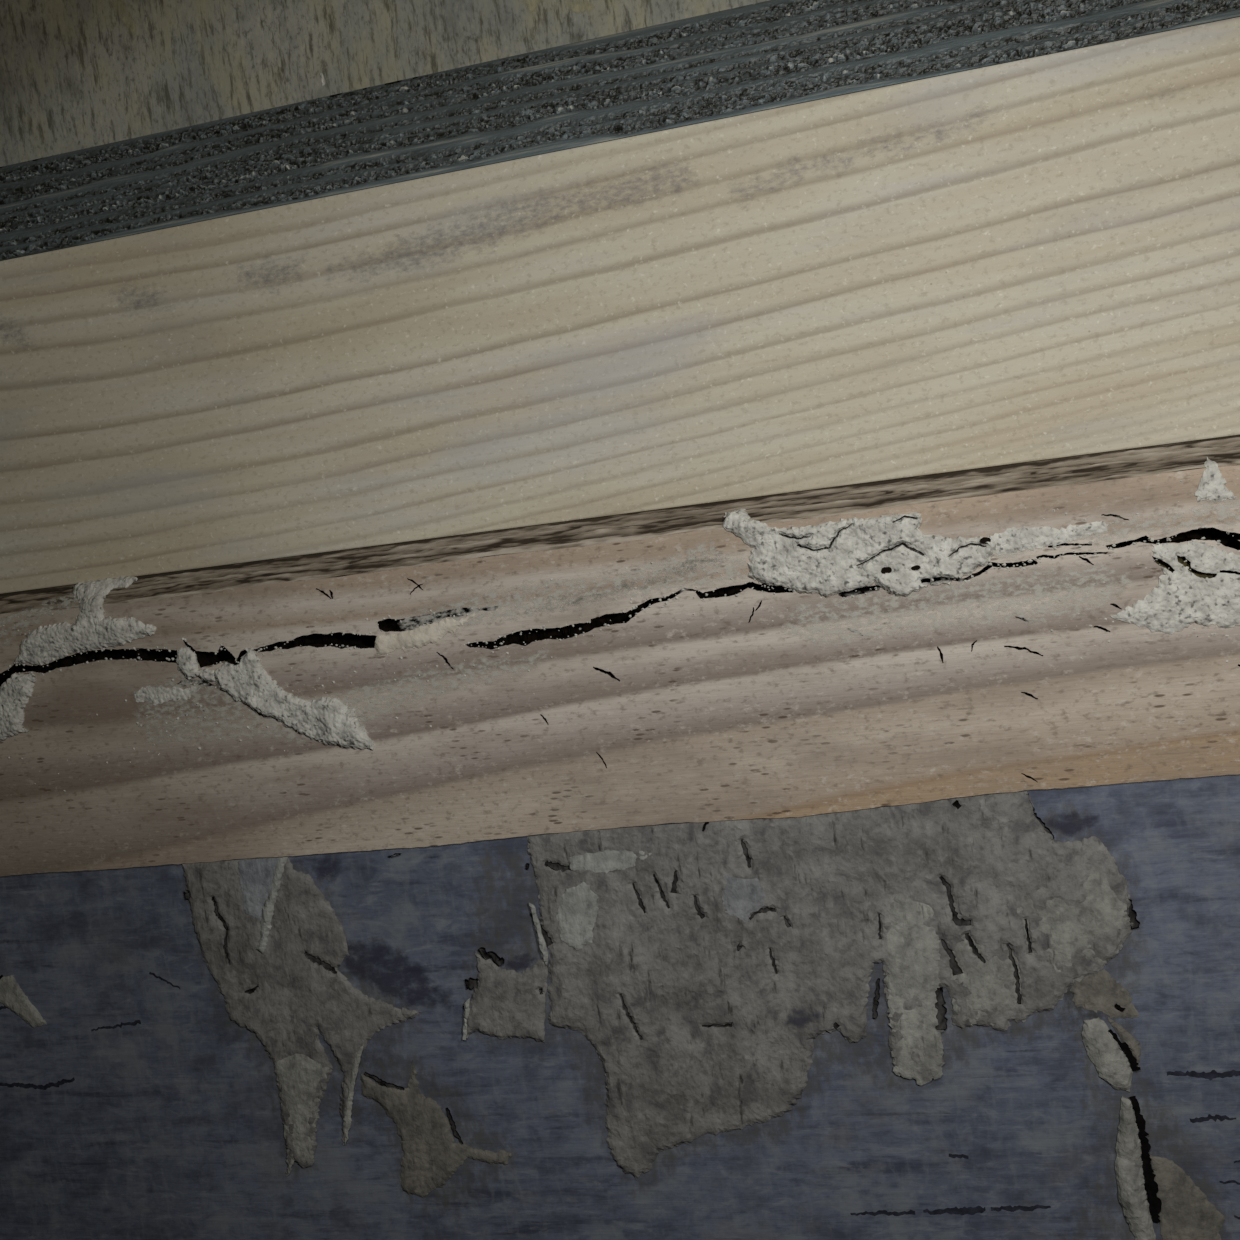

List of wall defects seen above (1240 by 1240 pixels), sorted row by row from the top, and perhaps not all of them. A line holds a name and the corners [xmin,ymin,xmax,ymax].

crack [921,514,1240,583]
crack [838,585,880,597]
crack [0,578,793,688]
crack [937,616,1043,663]
crack [1093,603,1122,632]